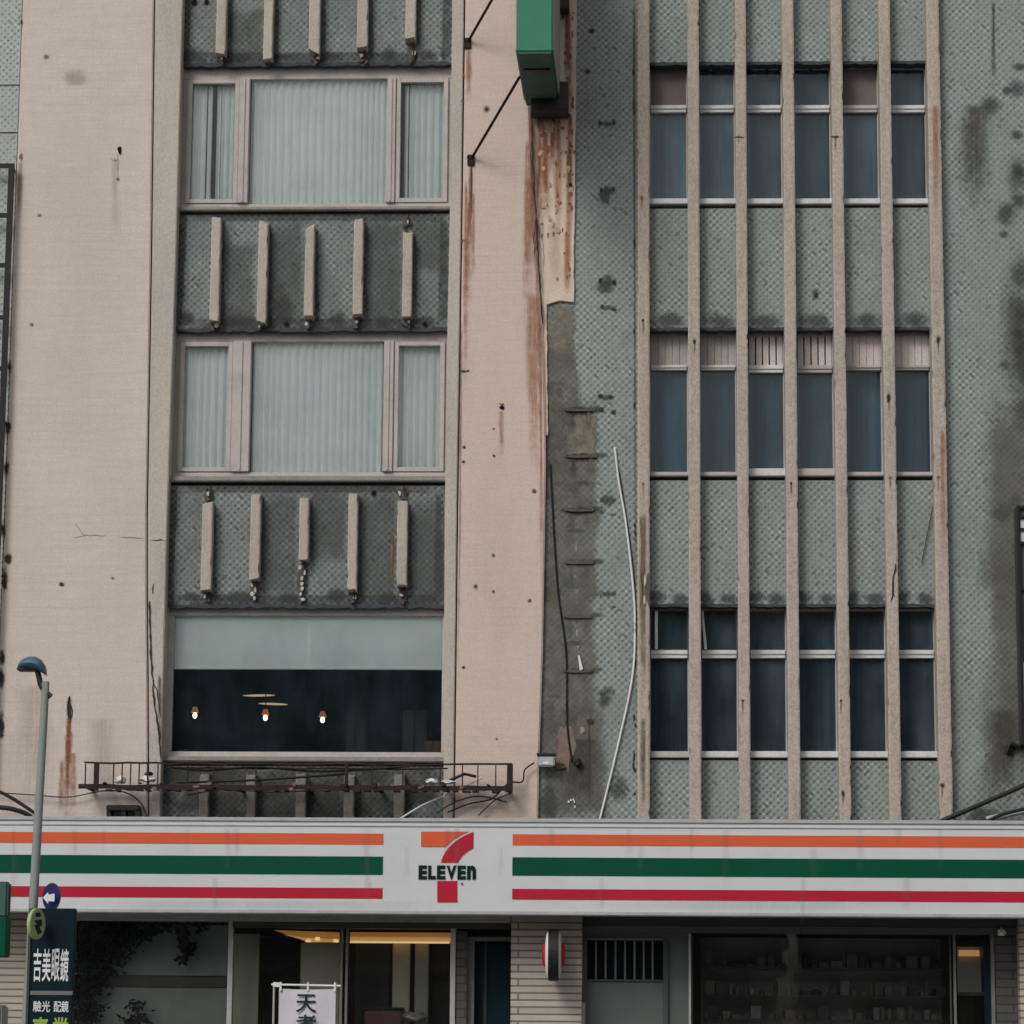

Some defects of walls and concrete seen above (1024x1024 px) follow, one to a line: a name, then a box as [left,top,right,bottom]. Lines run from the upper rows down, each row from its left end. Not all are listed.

rust [461,166,474,289]
rust [525,115,542,474]
peeling [537,114,573,238]
rust [556,12,575,280]
leakage [633,130,644,409]
leakage [967,87,1019,174]
leakage [999,196,1023,236]
crack [73,523,164,541]
rust [60,719,75,801]